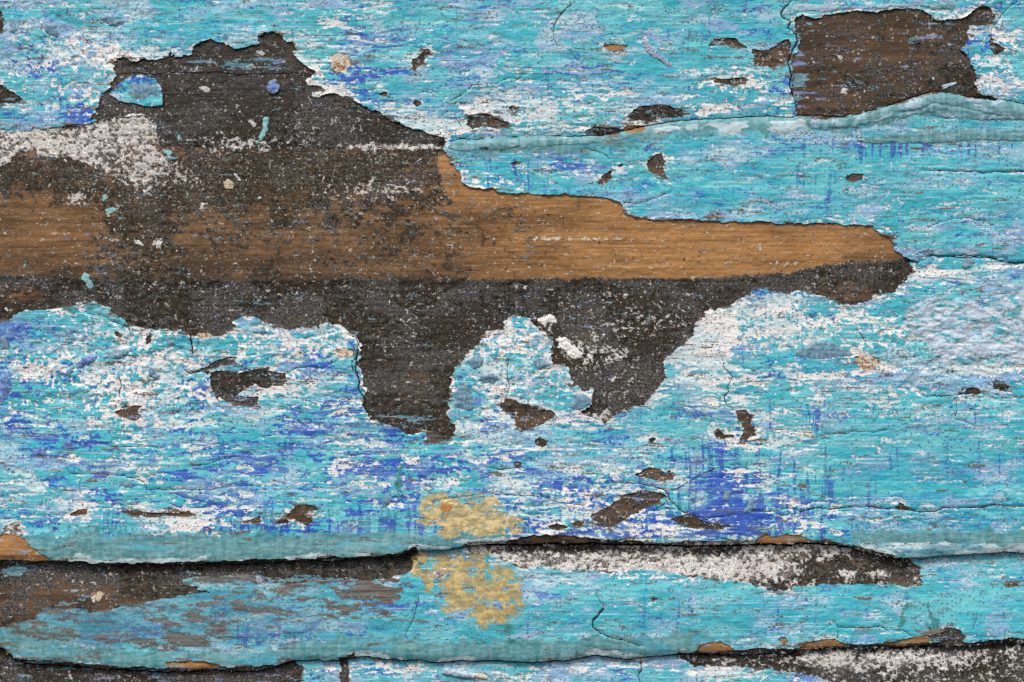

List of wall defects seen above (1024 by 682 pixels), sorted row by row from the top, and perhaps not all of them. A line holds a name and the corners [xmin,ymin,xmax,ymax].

crack [780,3,798,116]
peeling [709,6,1005,120]
peeling [0,32,913,444]
peeling [500,398,555,447]
peeling [0,520,418,627]
crack [592,571,642,681]
peeling [462,467,923,592]
peeling [676,628,1024,682]